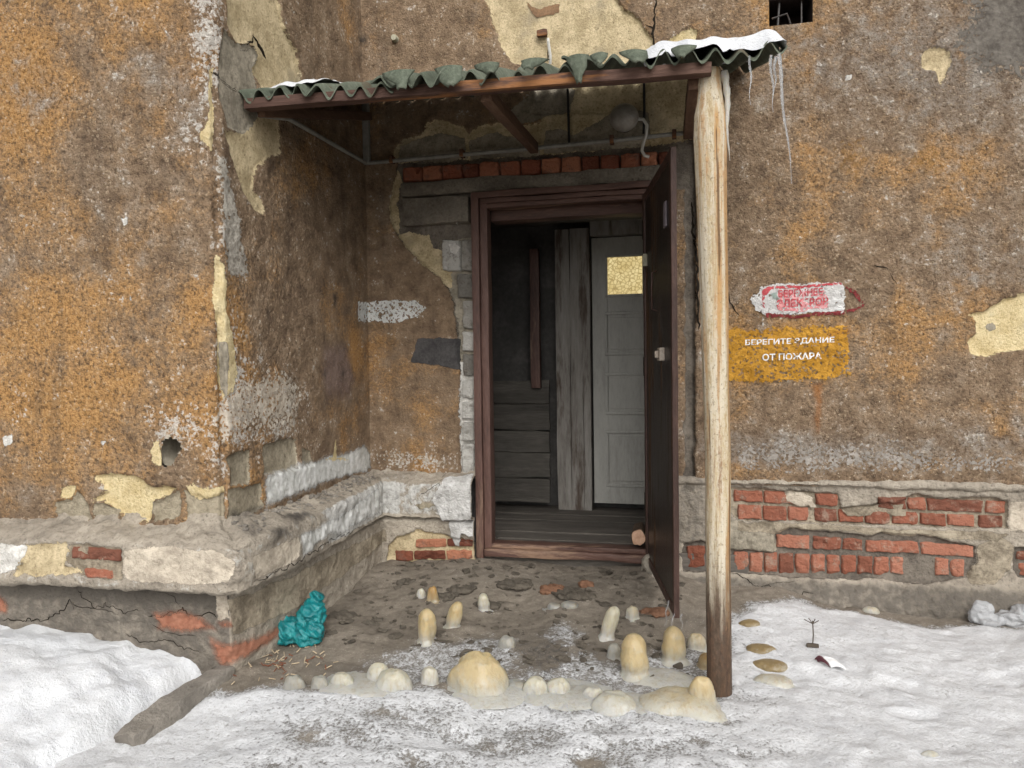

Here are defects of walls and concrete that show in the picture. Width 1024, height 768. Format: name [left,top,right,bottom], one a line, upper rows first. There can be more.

flaking render [485,0,653,68]
crack [645,0,657,45]
flaking render [199,0,302,214]
flaking render [389,79,697,478]
spalling [212,255,238,399]
flaking render [967,293,1024,357]
spalling [150,426,189,466]
peeling [55,438,371,523]
flaking render [0,541,123,580]
flaking render [387,529,475,562]
flaking render [730,487,1008,585]
crack [3,585,216,652]